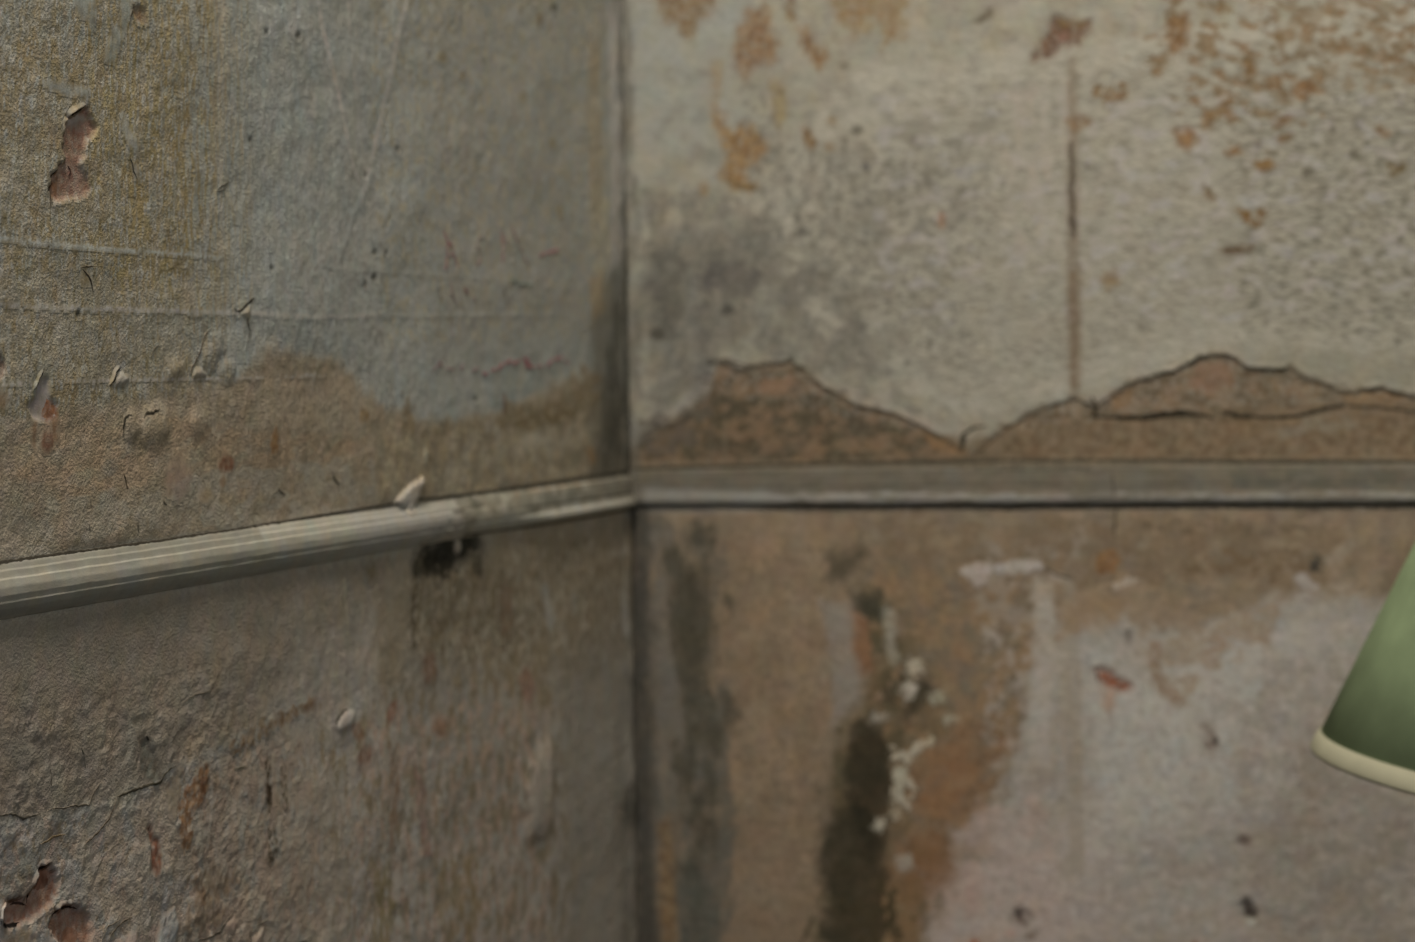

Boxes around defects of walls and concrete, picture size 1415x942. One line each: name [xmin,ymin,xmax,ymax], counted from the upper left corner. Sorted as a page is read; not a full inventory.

peeling [1023,11,1095,68]
peeling [1091,0,1415,175]
flaking render [48,100,98,208]
peeling [1199,180,1271,258]
peeling [1383,159,1409,178]
flaking render [633,347,1415,469]
water stain [406,478,521,692]
water stain [620,506,749,942]
water stain [791,507,1360,942]
crack [0,765,176,844]
flaking render [0,858,96,942]